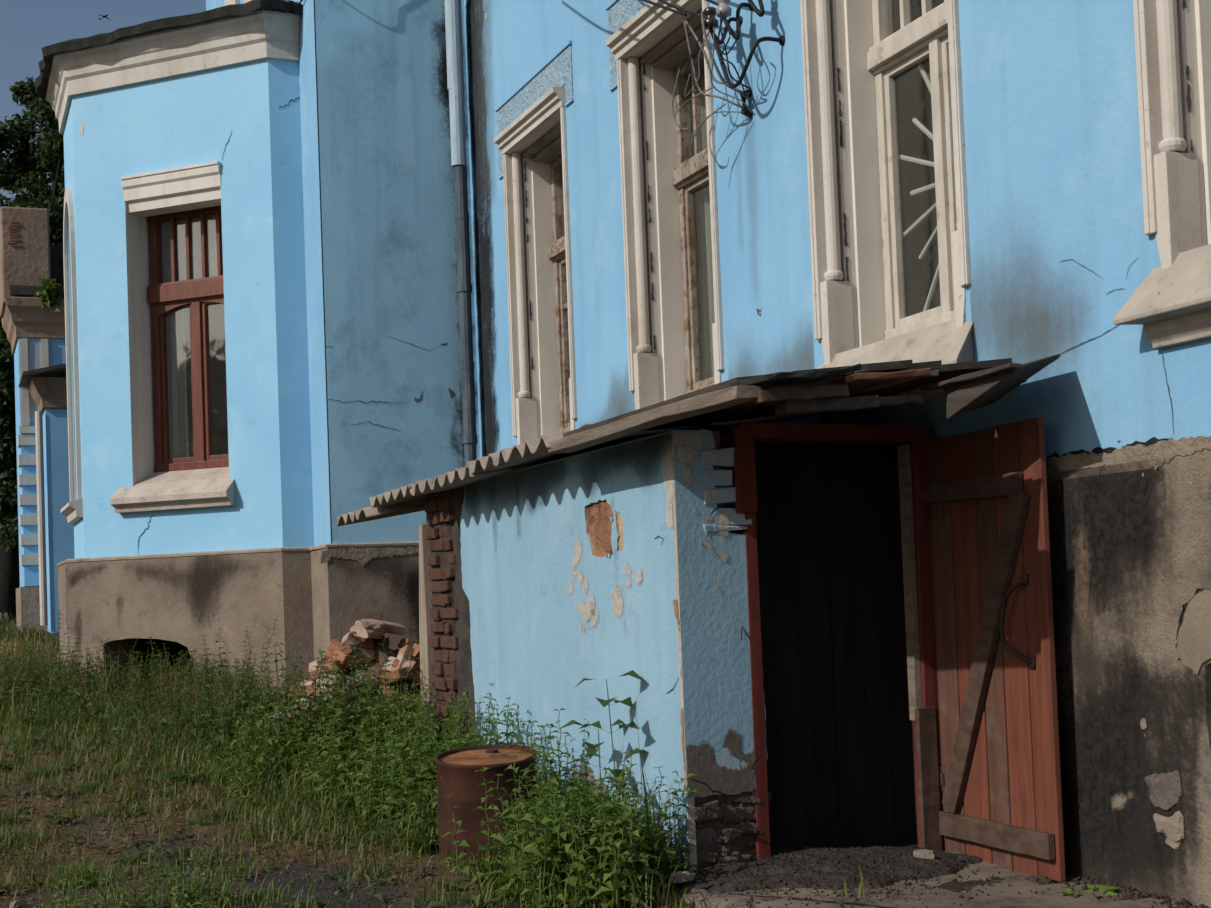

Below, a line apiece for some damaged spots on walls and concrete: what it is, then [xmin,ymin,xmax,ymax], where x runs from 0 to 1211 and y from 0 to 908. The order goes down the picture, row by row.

crack [1060,259,1136,294]
crack [1060,325,1118,354]
crack [326,399,401,432]
crack [1047,352,1174,459]
water stain [138,555,236,620]
spalling [568,501,642,630]
spalling [686,729,772,868]
spalling [1153,811,1184,850]